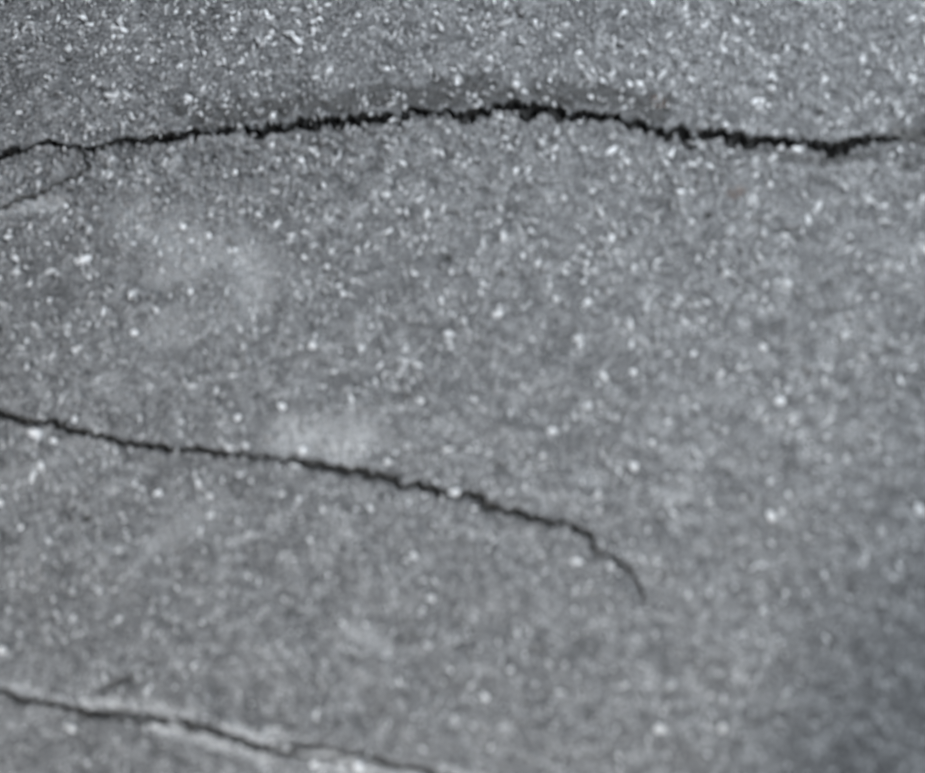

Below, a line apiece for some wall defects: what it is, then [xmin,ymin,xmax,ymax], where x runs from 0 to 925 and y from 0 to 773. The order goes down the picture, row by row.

crack [0,98,925,210]
crack [0,409,644,601]
crack [0,666,468,773]